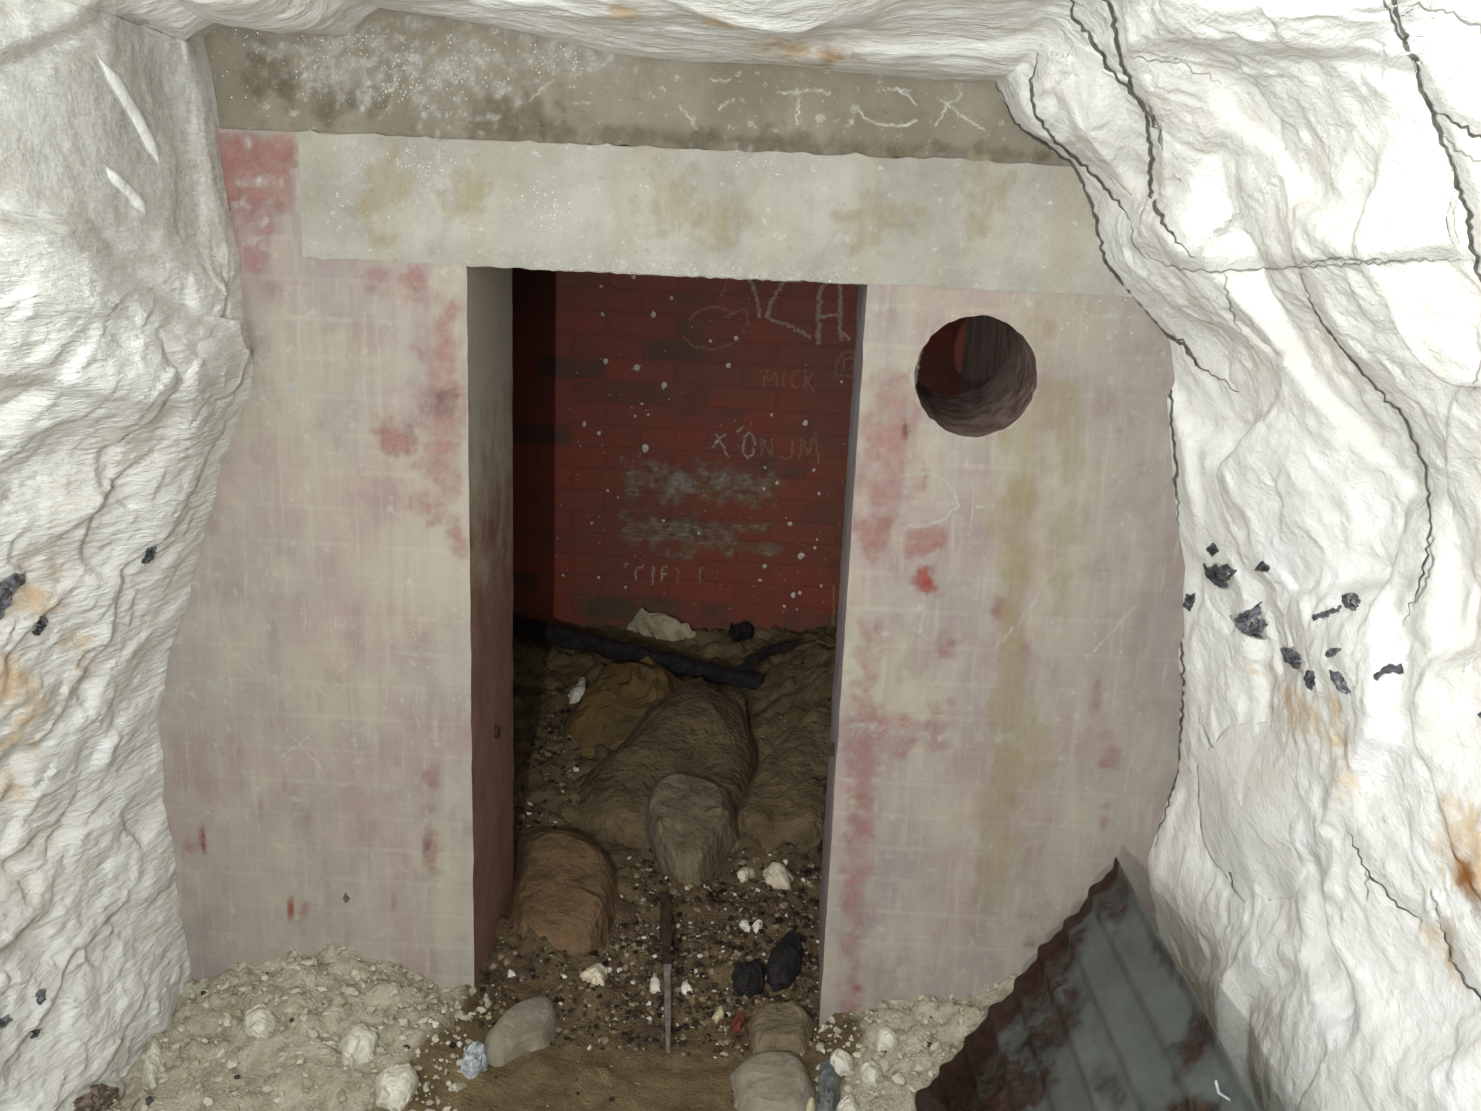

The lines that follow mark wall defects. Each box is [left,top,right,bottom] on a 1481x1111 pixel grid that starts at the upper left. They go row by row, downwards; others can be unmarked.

crack [995,0,1481,623]
crack [1155,634,1214,846]